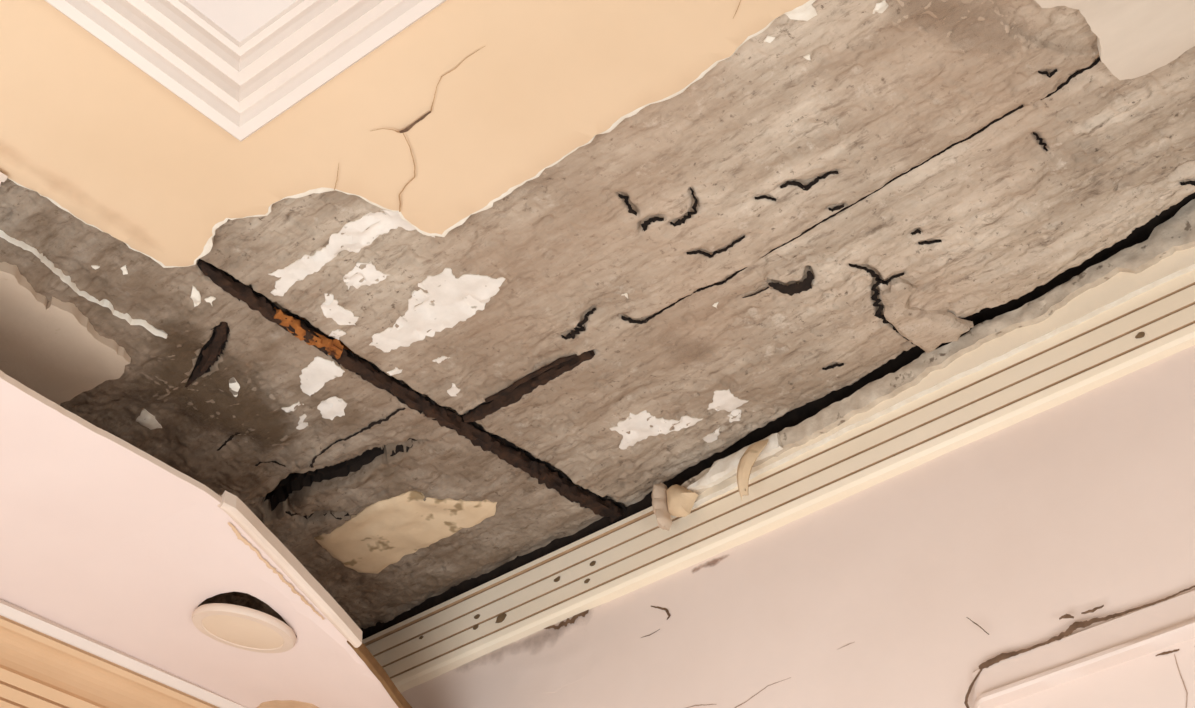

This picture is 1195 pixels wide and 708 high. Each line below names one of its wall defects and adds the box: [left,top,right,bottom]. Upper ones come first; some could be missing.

crack [372,46,485,212]
crack [561,56,1100,350]
crack [1180,179,1195,187]
peeling [268,209,416,296]
peeling [876,277,974,353]
spalling [197,259,626,523]
peeling [610,410,703,450]
peeling [707,389,749,422]
crack [822,362,844,370]
spalling [197,591,296,635]
crack [964,585,1195,708]
crack [686,677,791,708]